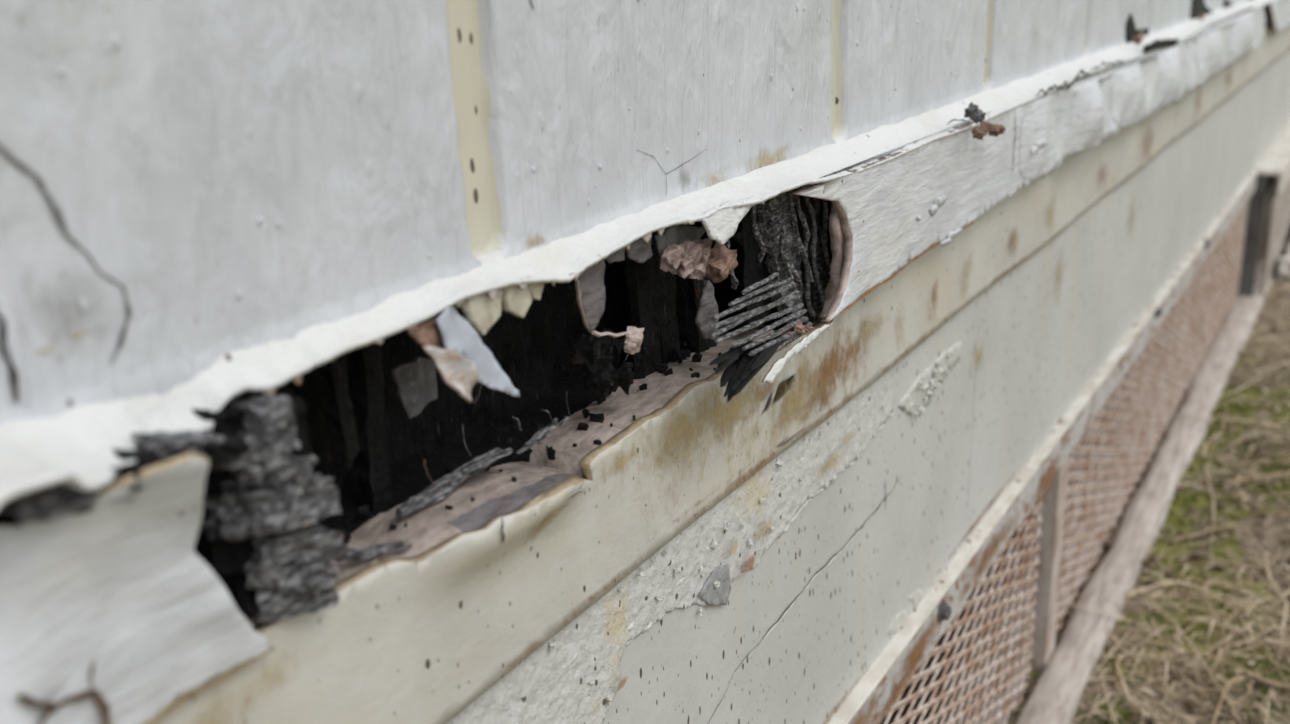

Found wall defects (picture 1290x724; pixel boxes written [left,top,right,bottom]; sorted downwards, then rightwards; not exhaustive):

crack [0,144,133,364]
spalling [374,233,652,465]
spalling [676,274,690,332]
spalling [685,220,741,326]
spalling [760,187,834,384]
rust [839,242,941,315]
spalling [223,365,354,489]
spalling [0,512,18,524]
spalling [203,469,235,514]
spalling [447,341,962,724]
crack [708,476,902,724]